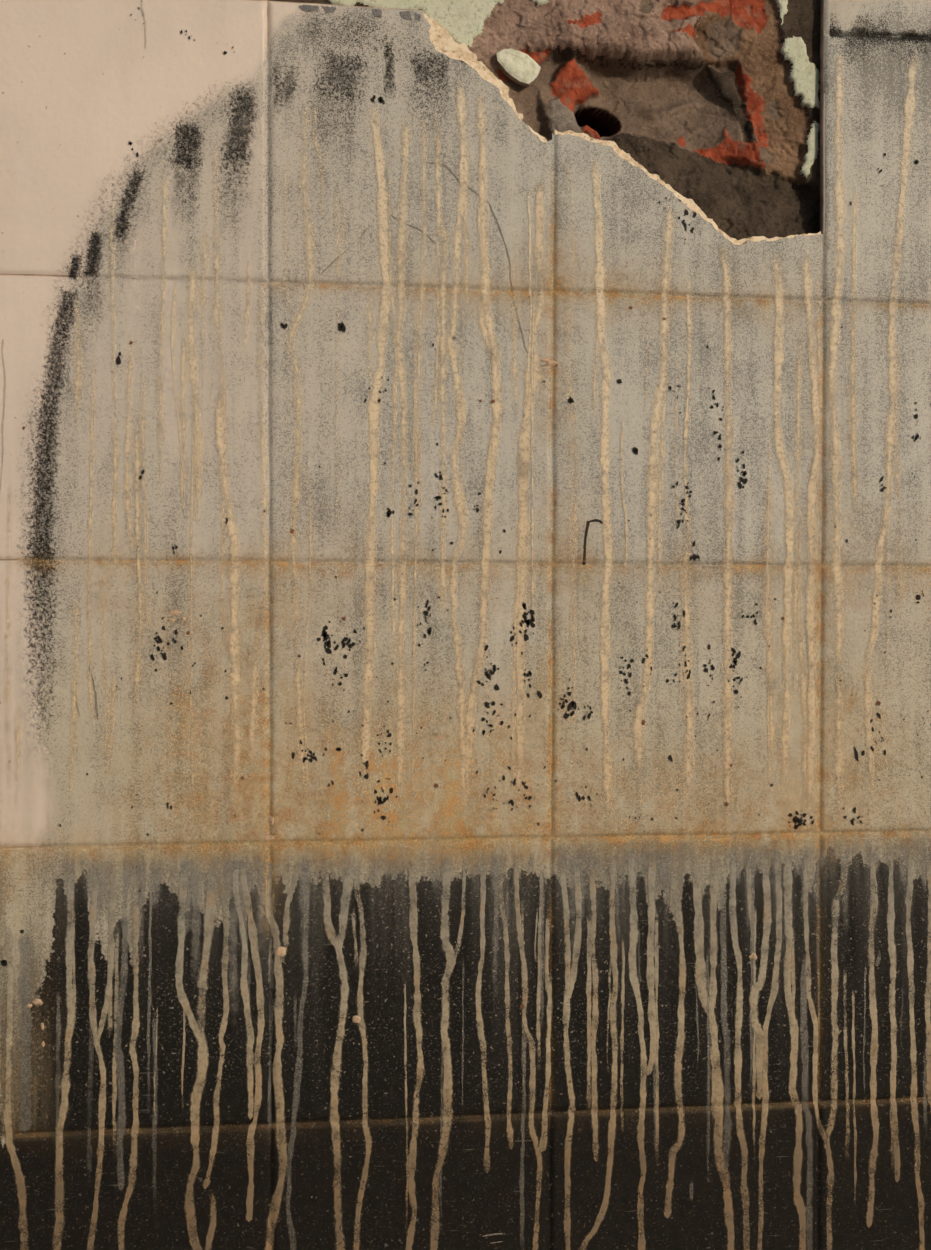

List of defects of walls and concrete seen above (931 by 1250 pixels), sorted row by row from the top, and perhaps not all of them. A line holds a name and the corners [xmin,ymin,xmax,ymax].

spalling [269,0,821,245]
water stain [67,254,81,279]
corrosion [322,744,493,846]
corrosion [605,822,833,846]
water stain [608,993,617,1044]
water stain [581,1046,618,1250]